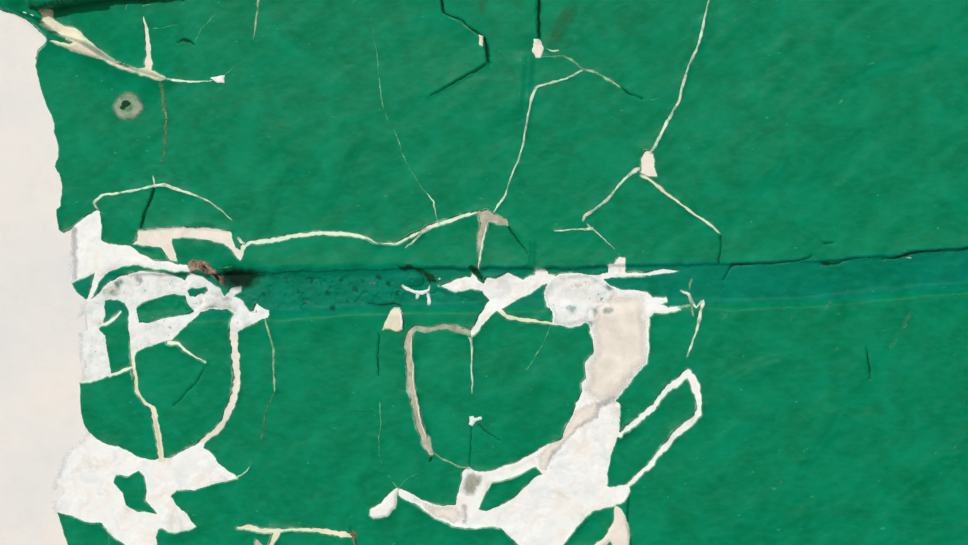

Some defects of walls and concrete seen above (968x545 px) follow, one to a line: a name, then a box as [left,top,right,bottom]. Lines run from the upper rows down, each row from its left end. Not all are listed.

peeling [38,9,232,83]
crack [93,0,940,279]
peeling [71,210,277,406]
peeling [370,209,680,545]
peeling [54,429,250,545]